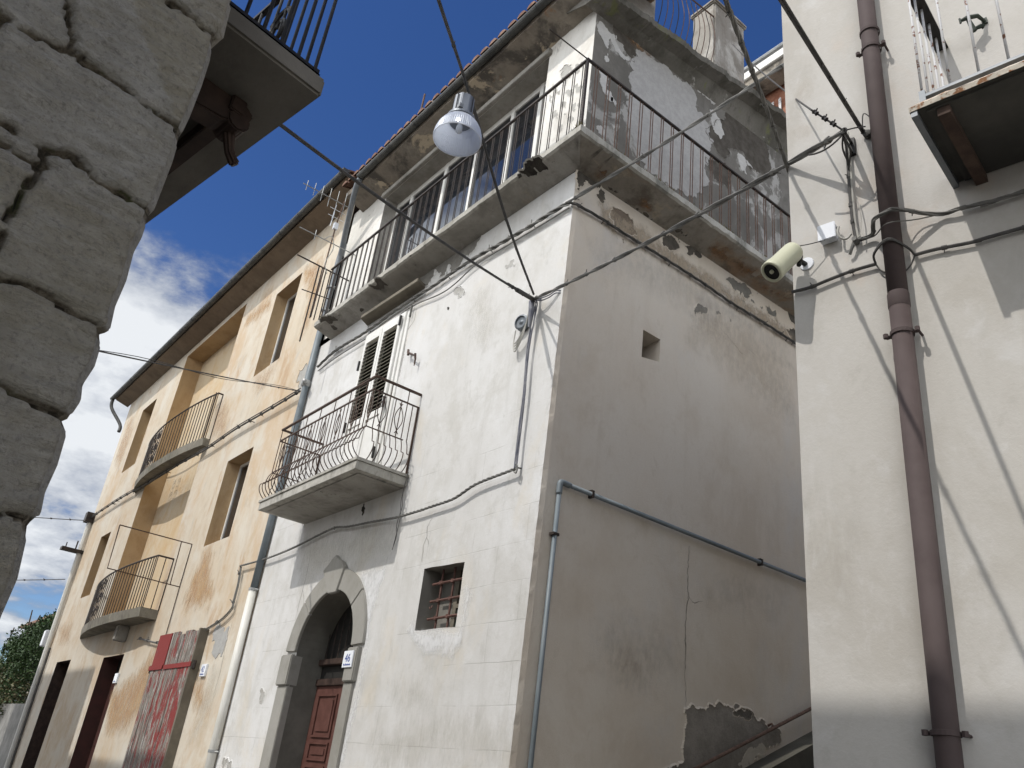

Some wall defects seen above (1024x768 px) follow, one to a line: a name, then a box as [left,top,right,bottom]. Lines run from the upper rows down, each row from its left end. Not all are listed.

flaking render [597,21,638,107]
spalling [517,155,550,179]
flaking render [661,228,703,260]
flaking render [693,302,731,322]
flaking render [724,276,796,344]
crack [684,555,700,705]
spalling [663,699,782,768]